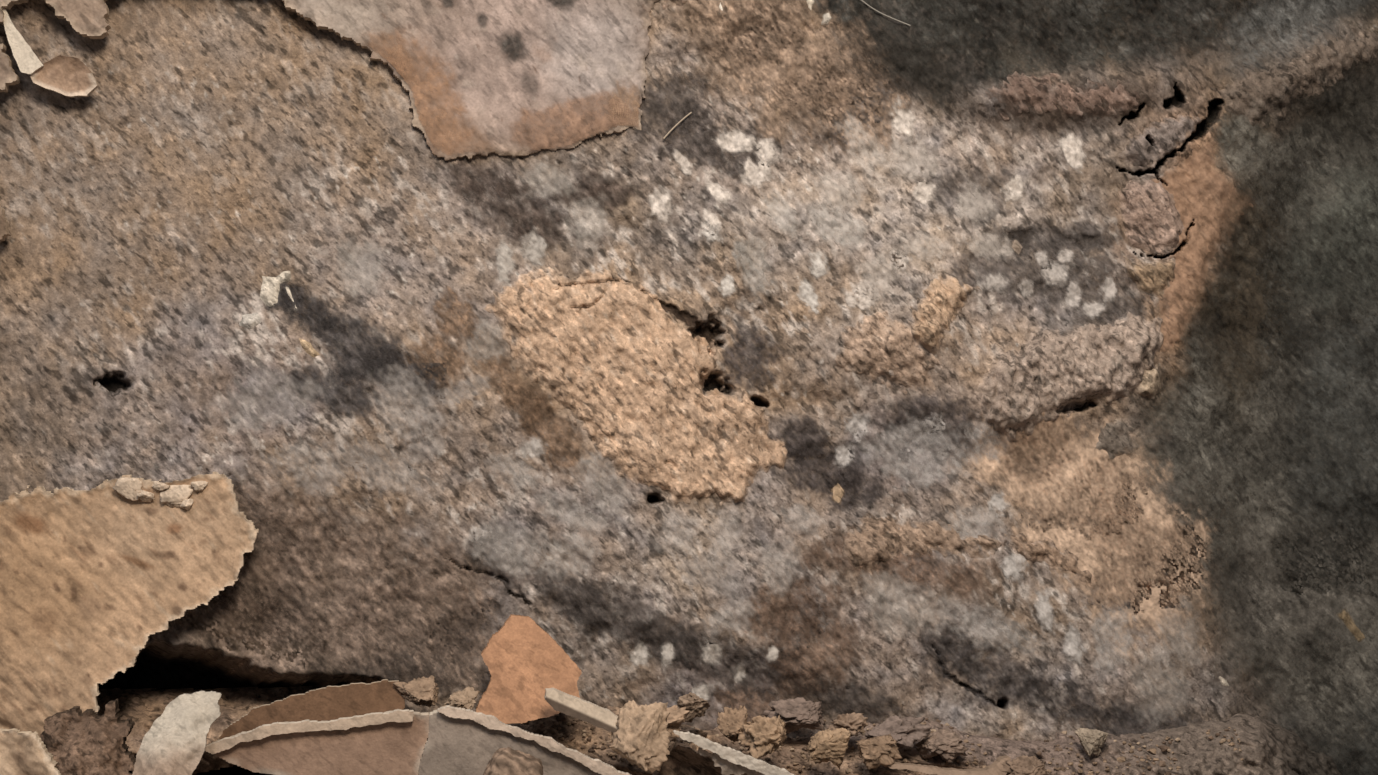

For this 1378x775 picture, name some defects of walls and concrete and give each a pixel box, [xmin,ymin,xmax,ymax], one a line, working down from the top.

flaking render [0,0,111,98]
flaking render [282,0,658,161]
water stain [635,0,1378,330]
crack [1116,83,1224,180]
water stain [267,282,581,470]
spalling [480,267,788,506]
water stain [769,414,883,510]
water stain [886,64,1378,775]
flaking render [0,471,259,738]
crack [453,560,530,606]
water stain [175,474,982,723]
crack [932,645,1003,708]